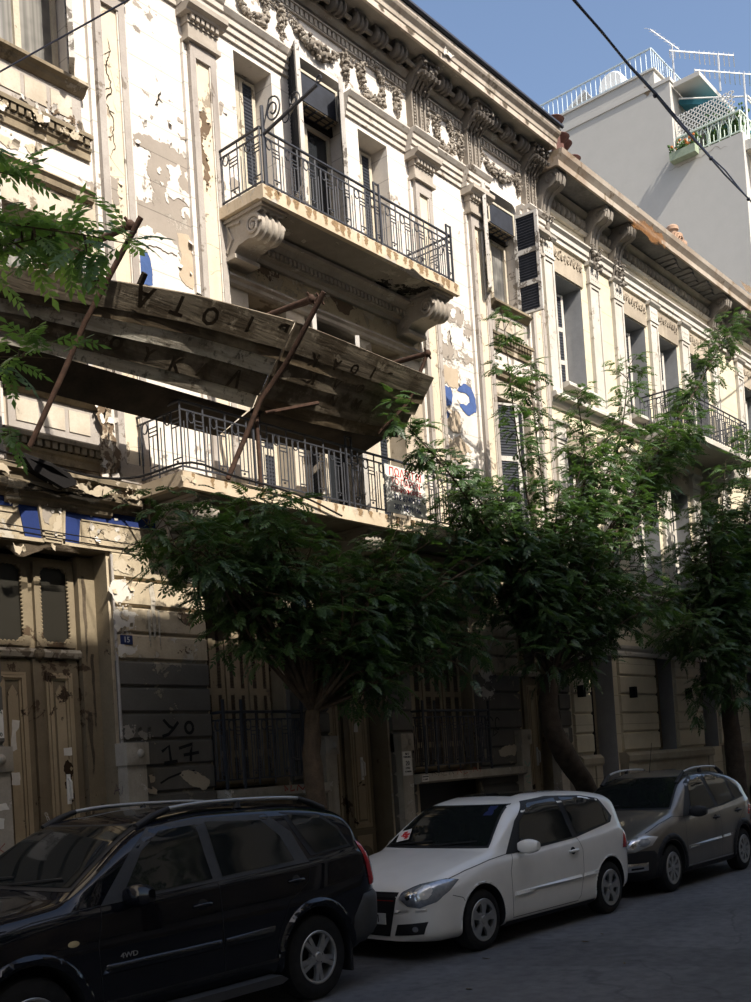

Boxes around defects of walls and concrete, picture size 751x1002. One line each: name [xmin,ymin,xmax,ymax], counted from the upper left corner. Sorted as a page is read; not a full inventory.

spalling [14,87,84,140]
crack [105,41,116,152]
peeling [0,129,43,158]
peeling [199,101,228,188]
peeling [111,170,124,222]
peeling [133,115,194,289]
peeling [224,177,241,205]
peeling [374,276,431,296]
peeling [441,302,476,465]
peeling [47,405,142,500]
spalling [180,769,210,790]